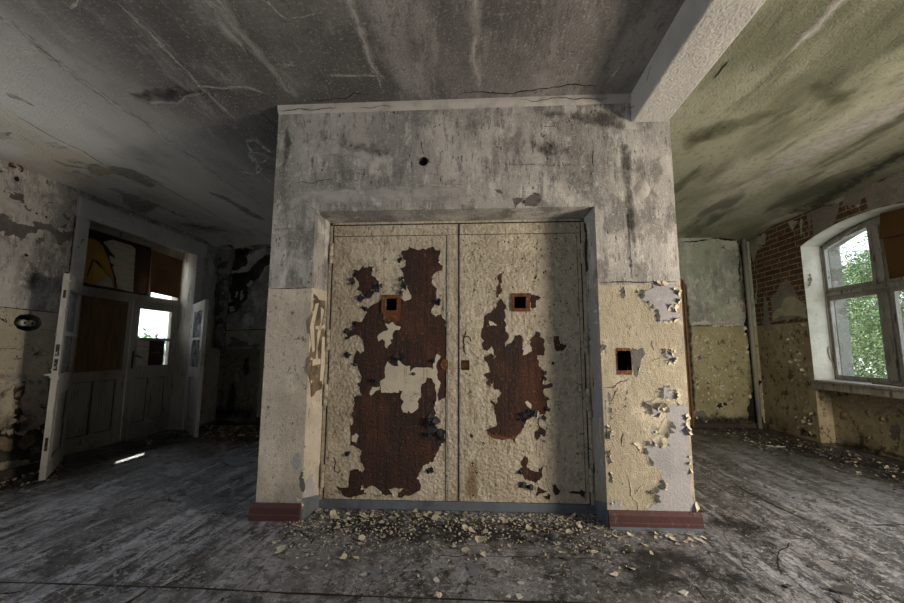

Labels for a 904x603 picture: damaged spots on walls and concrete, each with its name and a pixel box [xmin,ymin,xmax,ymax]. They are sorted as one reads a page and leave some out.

leakage [572,114,615,126]
leakage [768,99,904,174]
spalling [0,189,74,249]
spalling [513,192,542,208]
leakage [627,195,635,243]
spalling [228,247,270,314]
peeling [0,309,65,466]
peeling [589,289,615,490]
peeling [634,312,752,515]